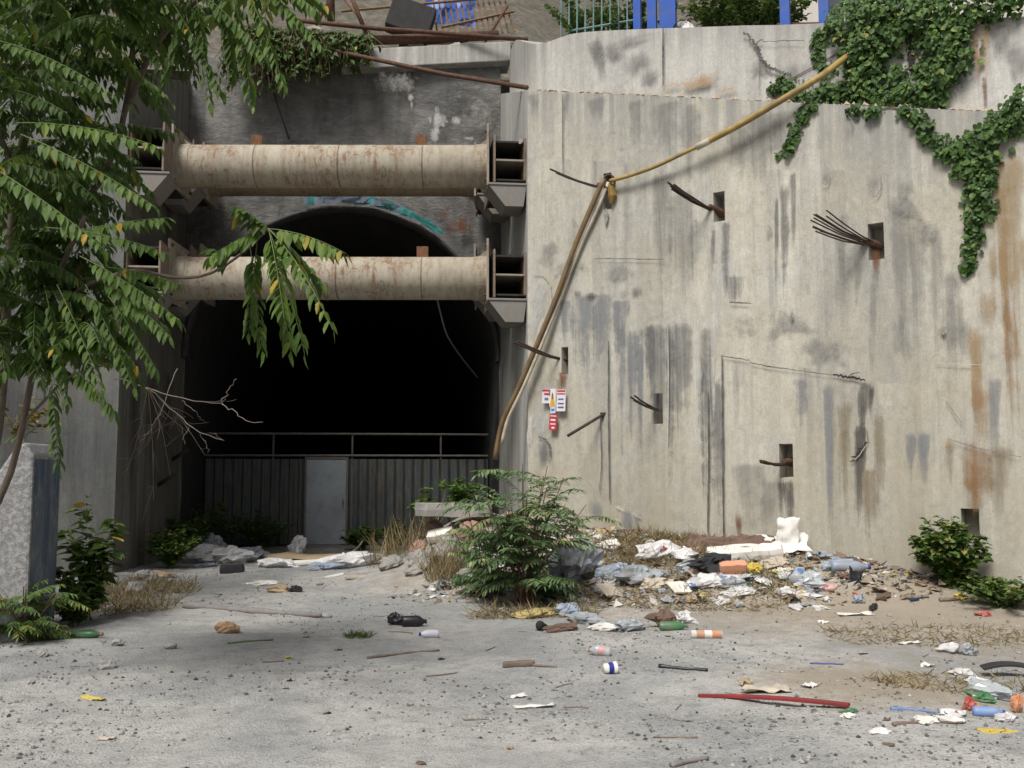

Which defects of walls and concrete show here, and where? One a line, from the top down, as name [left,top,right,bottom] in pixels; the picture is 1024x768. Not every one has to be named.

damp [380,72,412,104]
crack [743,32,804,80]
damp [561,223,736,457]
crack [721,355,865,381]
damp [824,388,833,499]
damp [855,384,873,497]